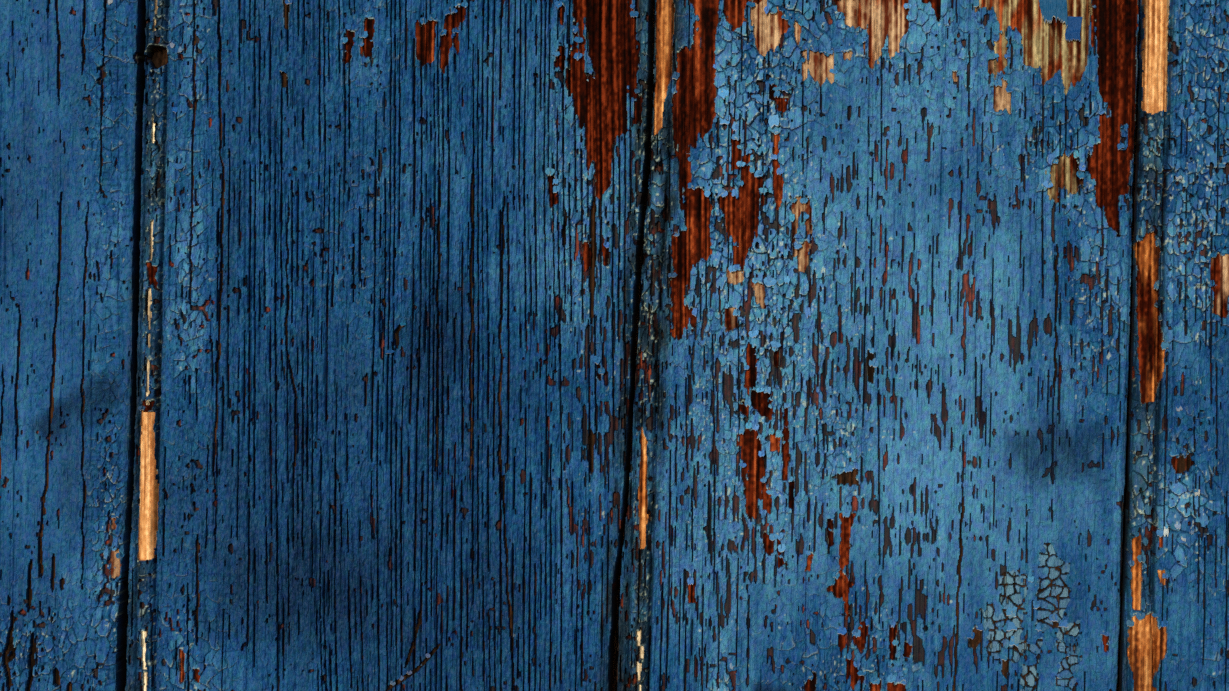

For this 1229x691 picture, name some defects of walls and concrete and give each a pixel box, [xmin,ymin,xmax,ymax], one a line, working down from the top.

peeling [343,14,375,64]
peeling [416,0,468,73]
peeling [545,168,560,208]
peeling [552,0,643,200]
peeling [668,0,941,340]
peeling [974,0,1139,237]
peeling [725,302,795,519]
peeling [763,532,787,567]
peeling [837,462,859,486]
peeling [827,510,907,691]
peeling [889,622,912,660]
crack [953,487,1082,691]